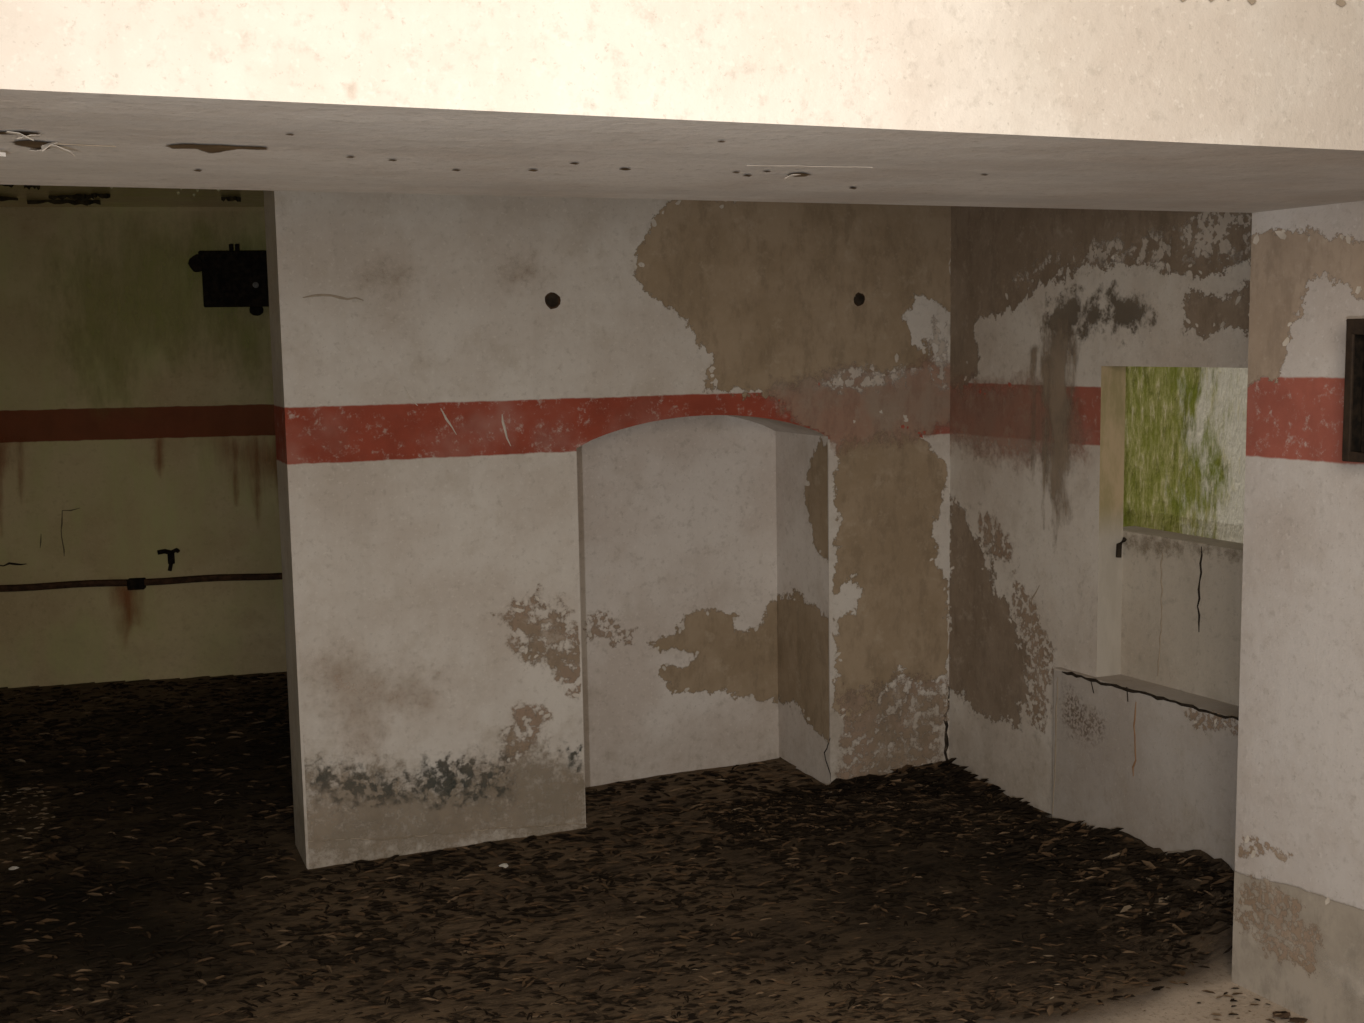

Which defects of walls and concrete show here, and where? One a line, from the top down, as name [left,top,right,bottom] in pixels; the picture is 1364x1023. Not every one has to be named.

spalling [0,131,75,157]
spalling [167,144,267,153]
peeling [0,184,111,206]
peeling [493,187,1364,780]
damp [305,745,584,867]